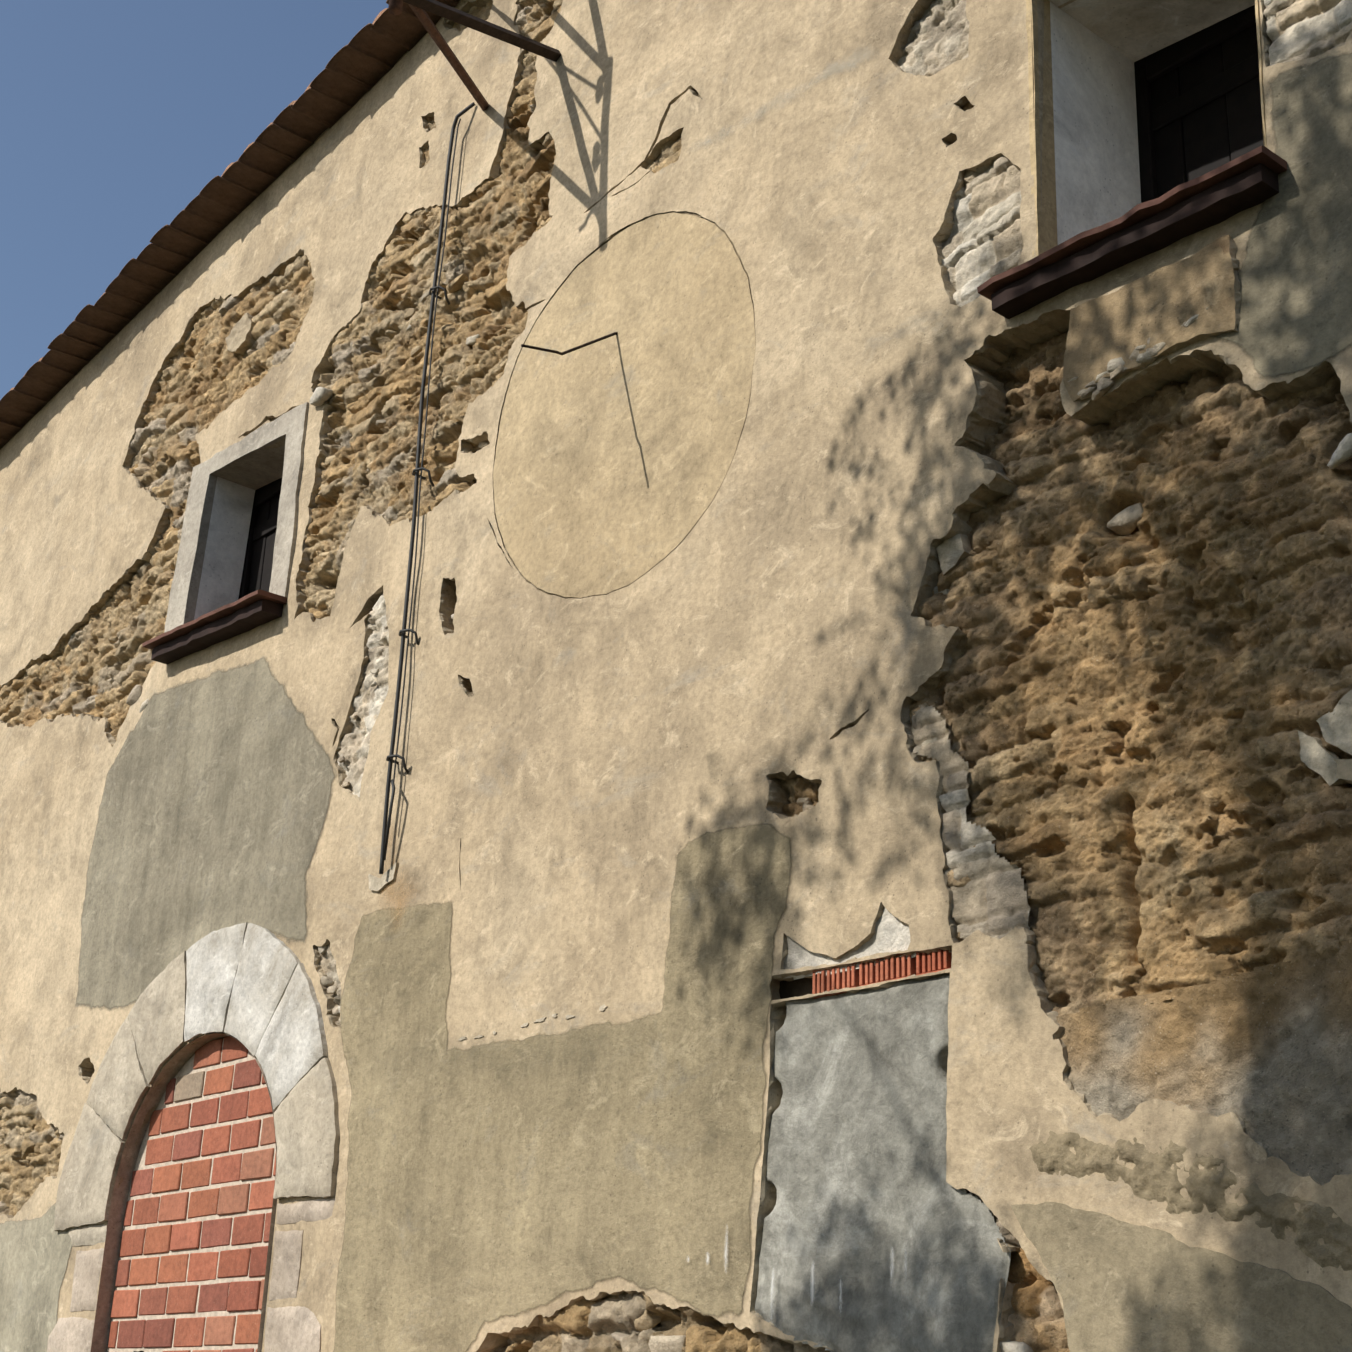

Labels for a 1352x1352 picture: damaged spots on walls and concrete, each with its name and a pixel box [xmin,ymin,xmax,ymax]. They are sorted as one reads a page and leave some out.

spalling [897,0,969,77]
spalling [1263,0,1352,66]
spalling [942,156,1024,307]
spalling [300,0,563,619]
spalling [0,255,315,741]
spalling [337,595,389,797]
spalling [781,777,822,817]
spalling [909,331,1352,1185]
spalling [0,1090,64,1216]
spalling [492,1292,828,1352]
spalling [967,1191,1070,1352]
peeling [1029,1131,1352,1271]